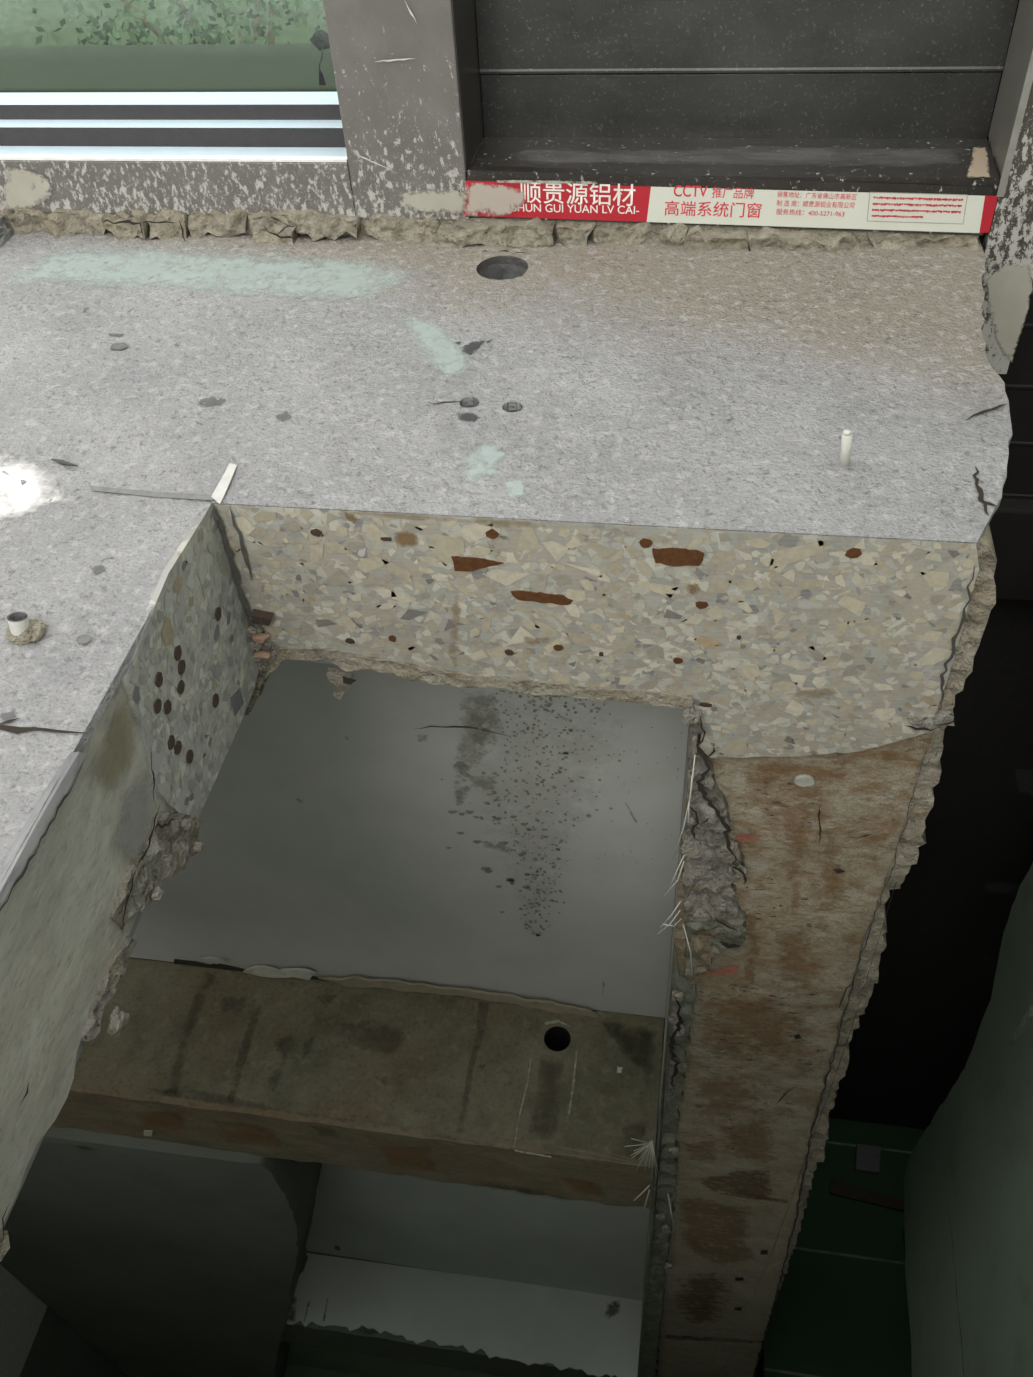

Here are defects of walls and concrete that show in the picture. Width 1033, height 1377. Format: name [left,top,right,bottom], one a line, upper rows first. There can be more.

damp [446,690,640,937]
spalling [81,507,977,1377]
crack [669,988,685,1097]
spalling [0,1229,10,1262]